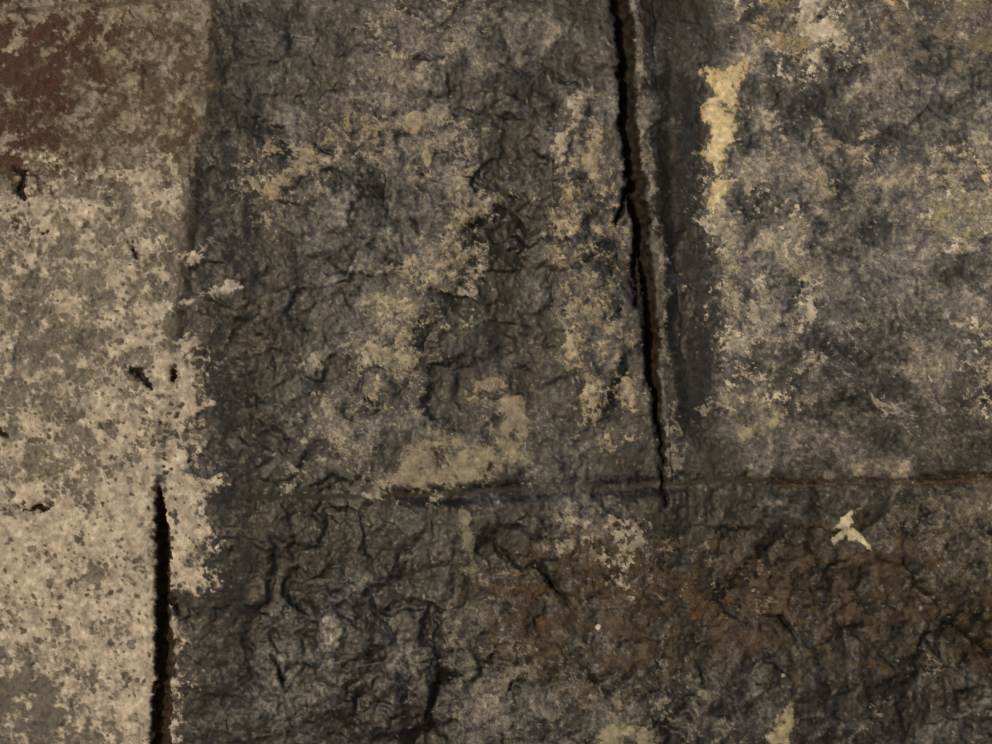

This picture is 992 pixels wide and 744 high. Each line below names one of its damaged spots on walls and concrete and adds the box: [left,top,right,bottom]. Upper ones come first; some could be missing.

crack [610,0,669,507]
crack [149,486,180,744]